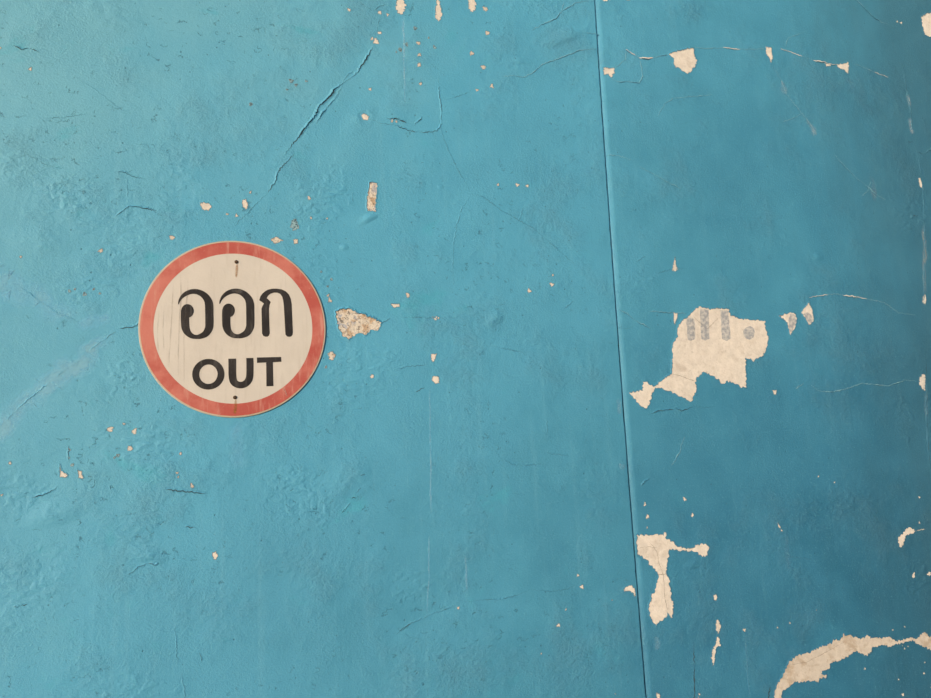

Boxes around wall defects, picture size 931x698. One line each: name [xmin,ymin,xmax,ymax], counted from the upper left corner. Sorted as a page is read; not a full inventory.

crack [232,1,386,228]
crack [611,49,667,84]
peeling [667,46,699,75]
peeling [919,10,931,38]
crack [370,77,579,267]
crack [694,33,931,315]
spalling [319,270,382,342]
peeling [628,304,769,411]
crack [796,351,931,479]
peeling [635,501,710,628]
peeling [896,520,926,549]
peeling [773,625,931,698]